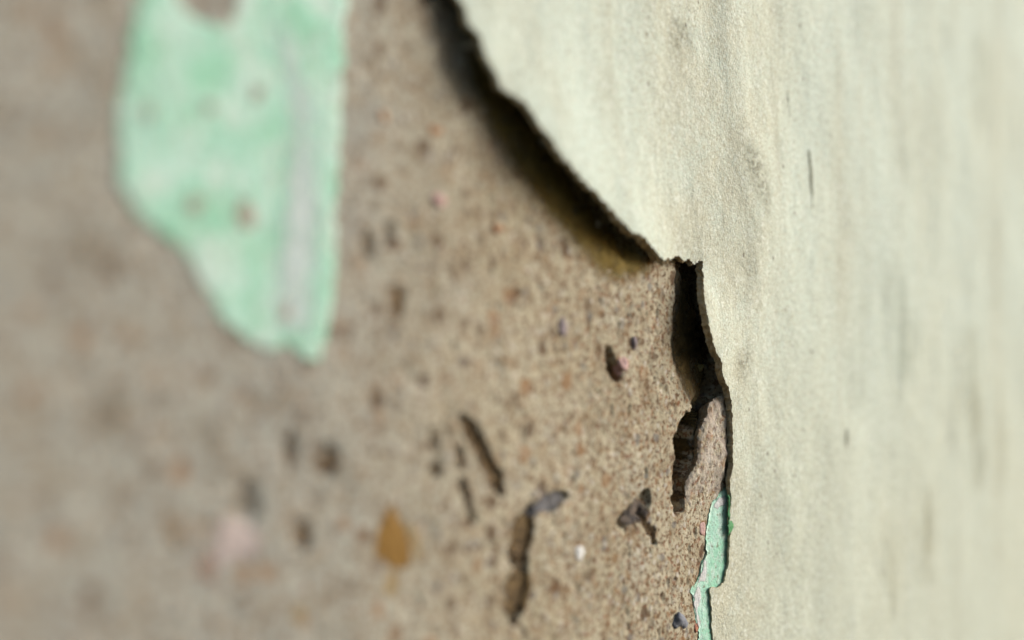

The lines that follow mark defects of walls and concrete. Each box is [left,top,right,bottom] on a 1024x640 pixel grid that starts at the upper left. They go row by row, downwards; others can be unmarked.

peeling [116,0,348,362]
spalling [390,286,404,315]
peeling [453,0,757,640]
crack [670,410,698,502]